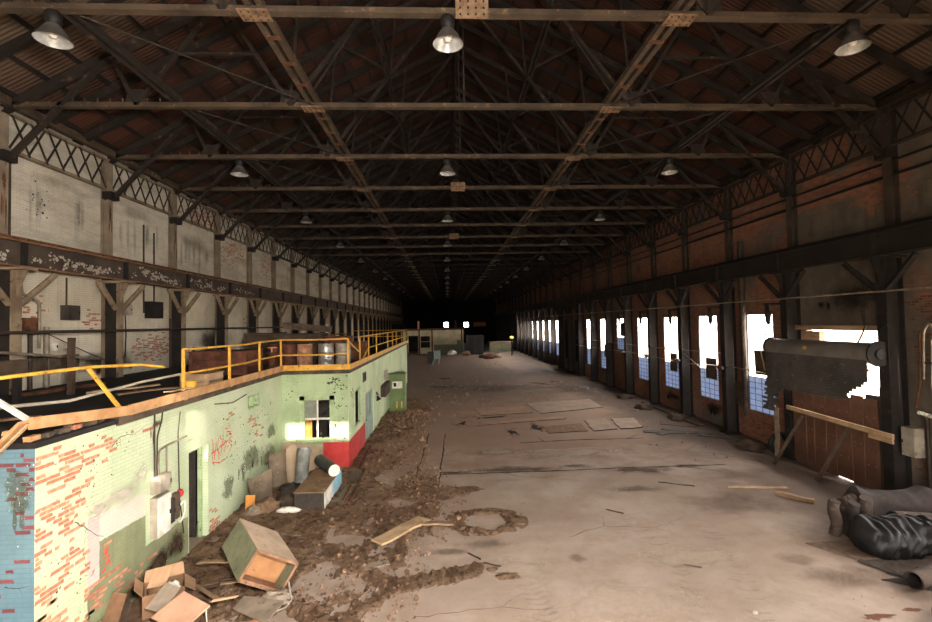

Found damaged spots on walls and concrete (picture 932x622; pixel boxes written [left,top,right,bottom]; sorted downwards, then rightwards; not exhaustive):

peeling [31,252,121,275]
peeling [131,267,255,295]
peeling [131,331,169,361]
peeling [0,435,157,622]